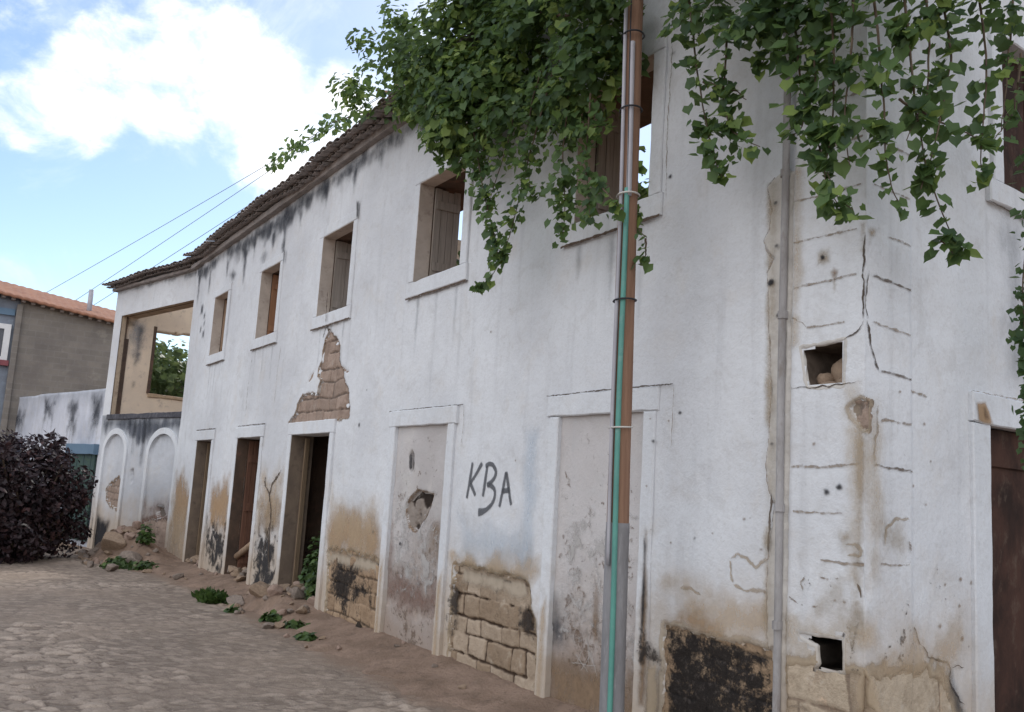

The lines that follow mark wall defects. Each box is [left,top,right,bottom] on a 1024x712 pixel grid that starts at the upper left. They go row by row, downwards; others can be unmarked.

water stain [188,151,367,283]
crack [846,237,879,369]
spalling [288,330,359,426]
crack [797,381,854,389]
water stain [206,522,226,573]
water stain [251,478,280,585]
crack [264,472,280,567]
spalling [324,545,380,629]
spalling [446,561,537,691]
water stain [647,621,773,712]
crack [729,553,766,592]
spalling [785,629,962,712]